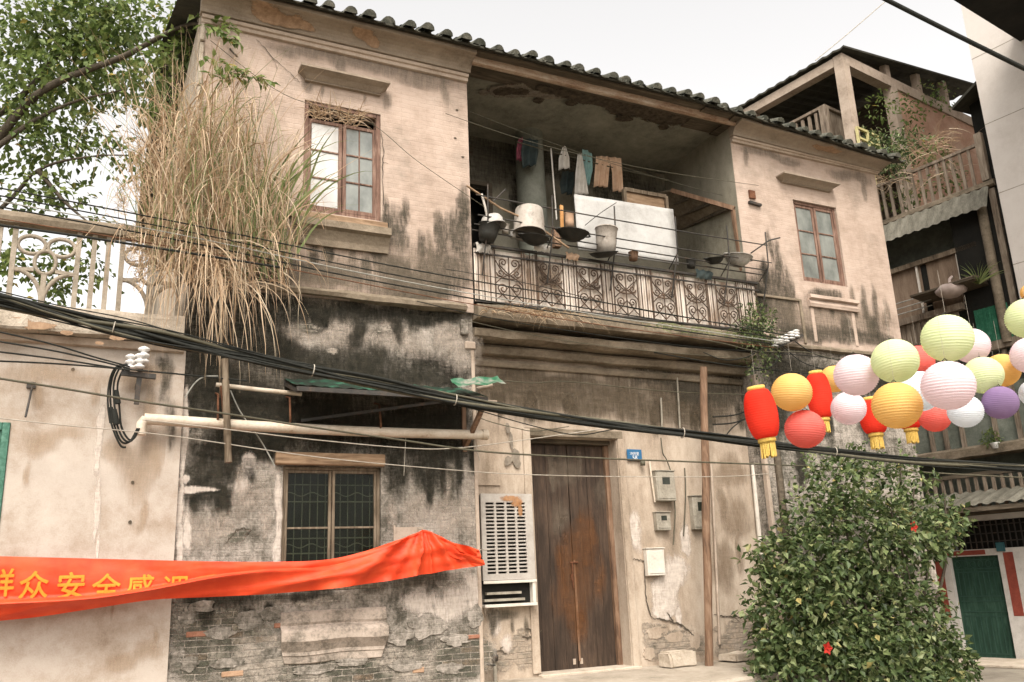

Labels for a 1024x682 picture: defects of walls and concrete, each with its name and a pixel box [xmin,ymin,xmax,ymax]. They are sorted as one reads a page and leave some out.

flaking render [478,83,691,130]
damp [751,235,891,345]
damp [158,358,173,394]
damp [169,136,747,562]
rust [502,496,522,515]
flaking render [293,595,338,607]
crack [633,558,694,636]
flaking render [168,600,532,682]
flaking render [642,607,761,661]